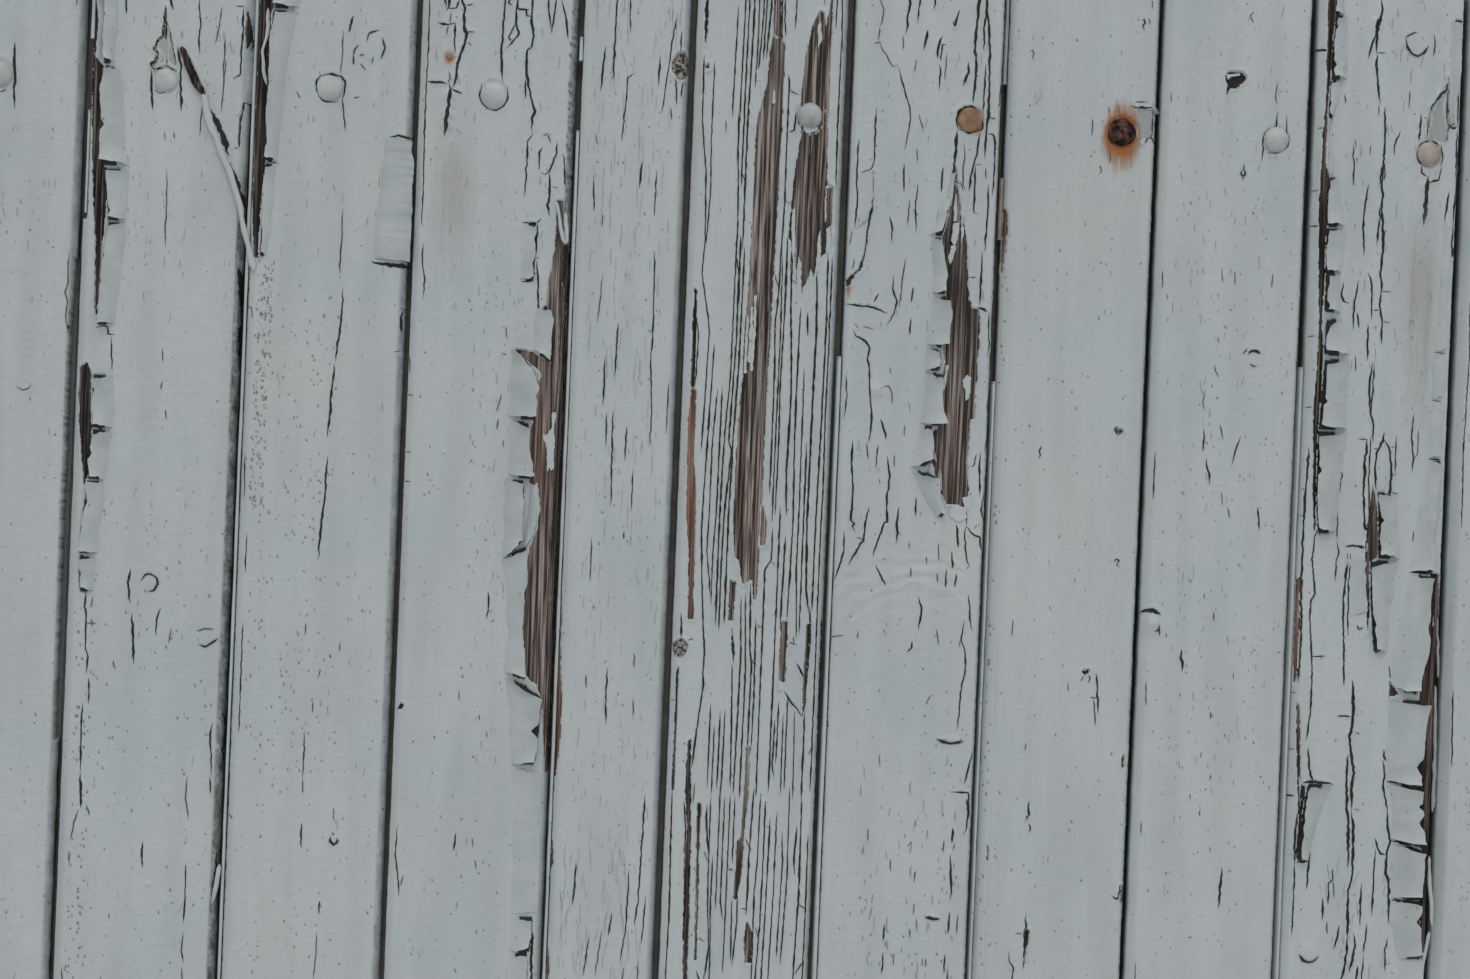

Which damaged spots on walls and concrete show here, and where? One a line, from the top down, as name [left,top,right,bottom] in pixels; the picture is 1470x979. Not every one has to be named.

peeling [77,363,115,591]
peeling [91,0,130,324]
peeling [236,0,301,370]
peeling [501,200,570,979]
crack [318,0,1027,979]
peeling [686,289,697,619]
peeling [728,0,833,662]
peeling [910,166,982,522]
rust [1104,104,1140,165]
peeling [1312,0,1350,532]
crack [1262,0,1470,979]
peeling [1344,225,1452,960]